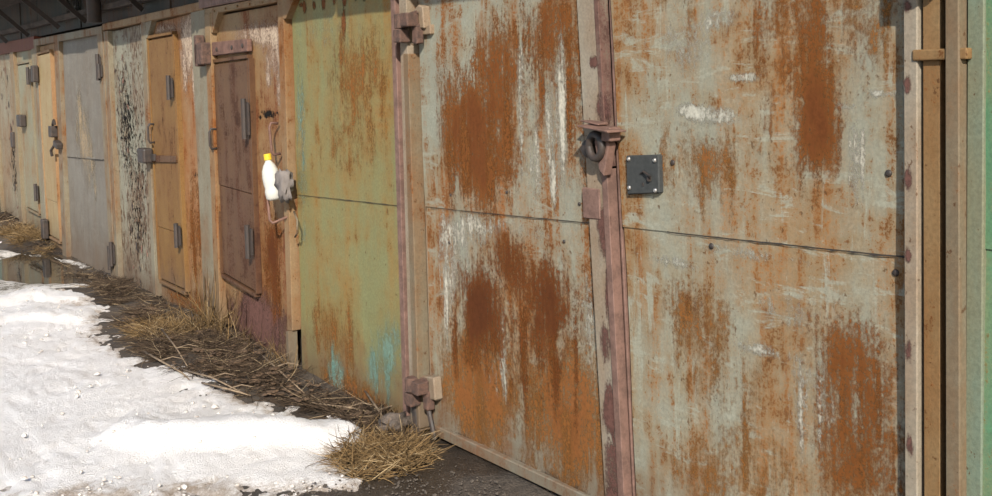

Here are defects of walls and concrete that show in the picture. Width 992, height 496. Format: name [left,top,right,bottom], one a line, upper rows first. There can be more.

rust [299,0,386,170]
rust [436,0,587,219]
rust [739,0,911,186]
rust [229,212,287,358]
rust [312,301,395,413]
rust [441,227,603,491]
rust [664,280,734,405]
rust [666,362,794,496]
rust [782,303,913,496]